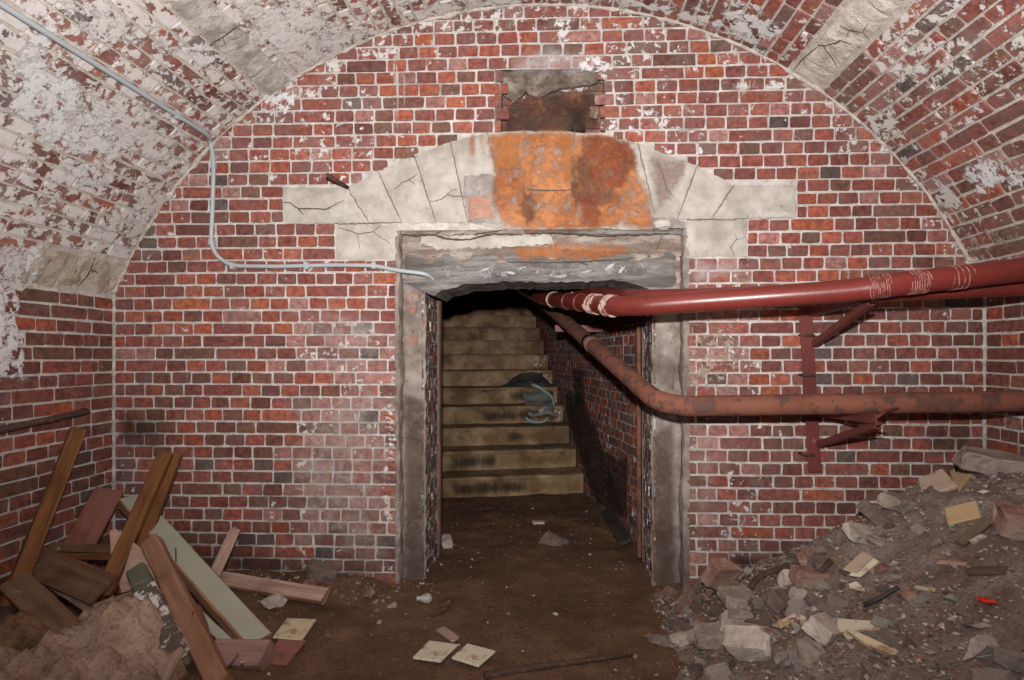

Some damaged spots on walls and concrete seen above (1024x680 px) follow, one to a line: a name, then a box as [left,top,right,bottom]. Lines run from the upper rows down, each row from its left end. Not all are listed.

peeling [26,23,64,72]
peeling [150,21,223,72]
crack [793,25,867,70]
leakage [506,89,596,132]
peeling [860,103,899,138]
crack [395,174,467,202]
rust [489,131,684,230]
peeling [930,178,963,211]
crack [284,201,670,265]
peeling [443,262,659,280]
rust [518,245,622,259]
spalling [665,264,681,289]